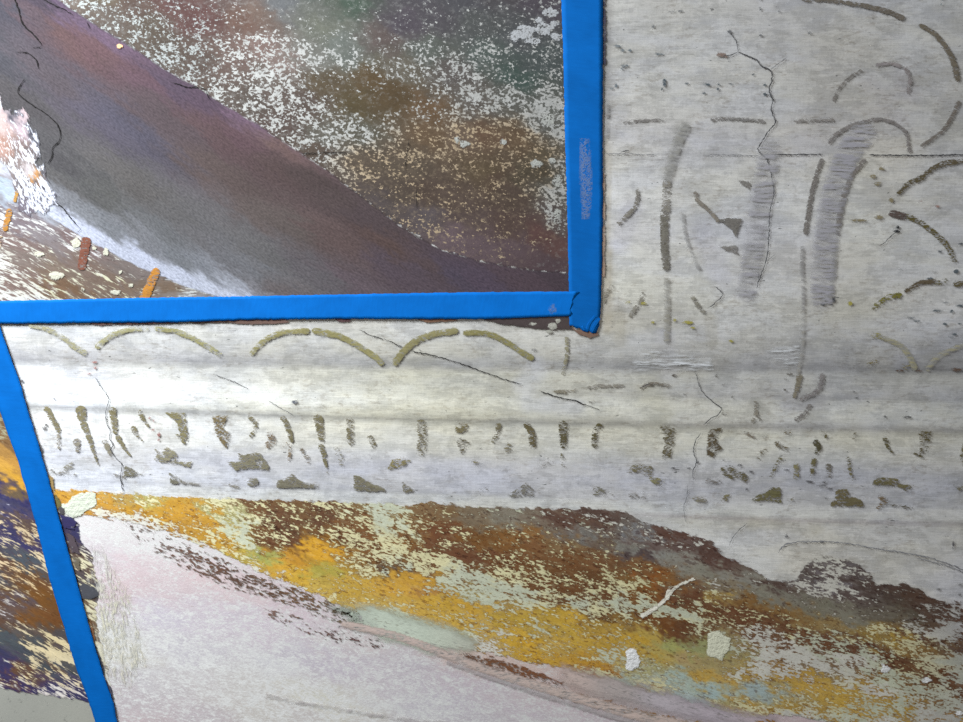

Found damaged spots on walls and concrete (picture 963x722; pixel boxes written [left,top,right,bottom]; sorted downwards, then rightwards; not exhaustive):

peeling [0,97,58,217]
crack [14,0,61,164]
peeling [59,0,569,273]
crack [724,33,780,287]
crack [96,379,123,490]
crack [361,330,519,384]
crack [541,391,599,410]
peeling [49,474,963,722]